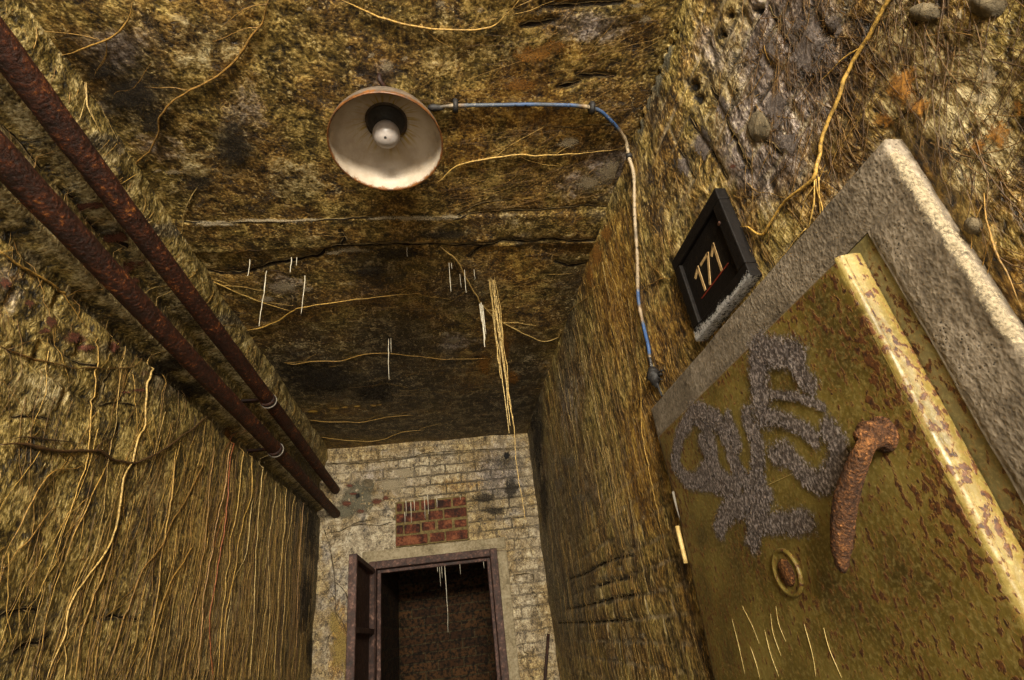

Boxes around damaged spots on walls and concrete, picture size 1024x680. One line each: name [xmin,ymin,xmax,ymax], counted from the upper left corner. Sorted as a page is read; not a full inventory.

crack [180,198,607,275]
spalling [336,481,388,518]
leakage [460,478,521,515]